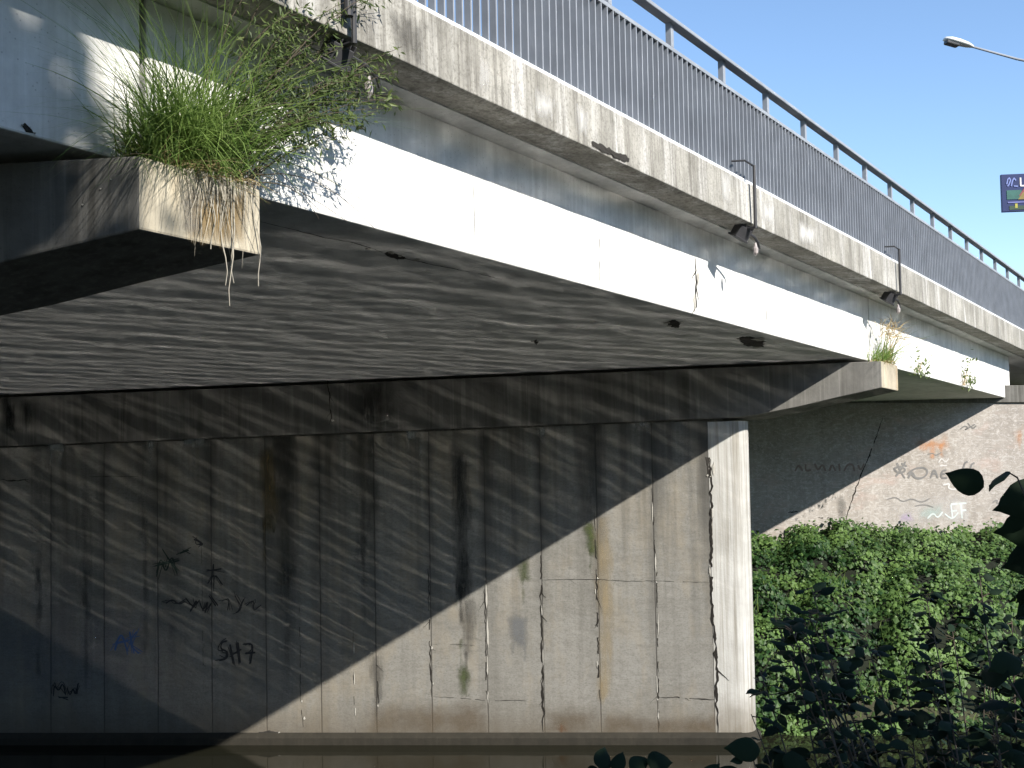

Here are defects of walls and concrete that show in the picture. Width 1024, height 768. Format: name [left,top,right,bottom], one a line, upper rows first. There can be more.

spalling [592,141,630,162]
crack [692,259,700,314]
spalling [737,336,766,348]
crack [788,418,883,520]
damp [454,453,469,598]
crack [423,518,619,729]
crack [651,457,728,730]